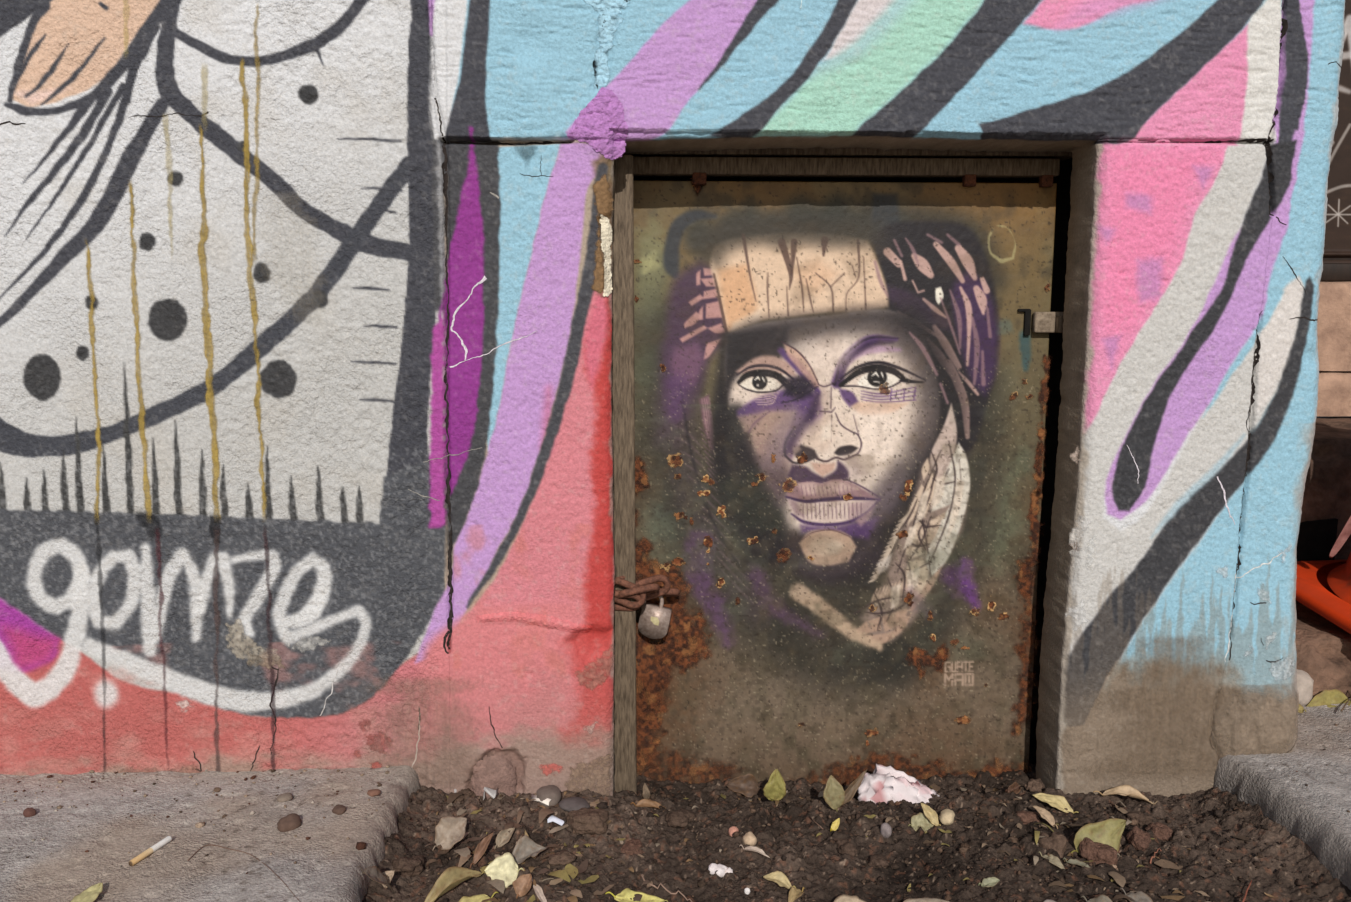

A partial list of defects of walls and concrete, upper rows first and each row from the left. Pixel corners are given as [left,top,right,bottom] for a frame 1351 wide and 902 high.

crack [1095,89,1286,225]
crack [1279,6,1288,53]
crack [434,98,572,654]
rust [635,458,711,772]
rust [667,453,683,479]
rust [838,727,1031,786]
rust [970,355,1051,735]
crack [1229,258,1318,663]